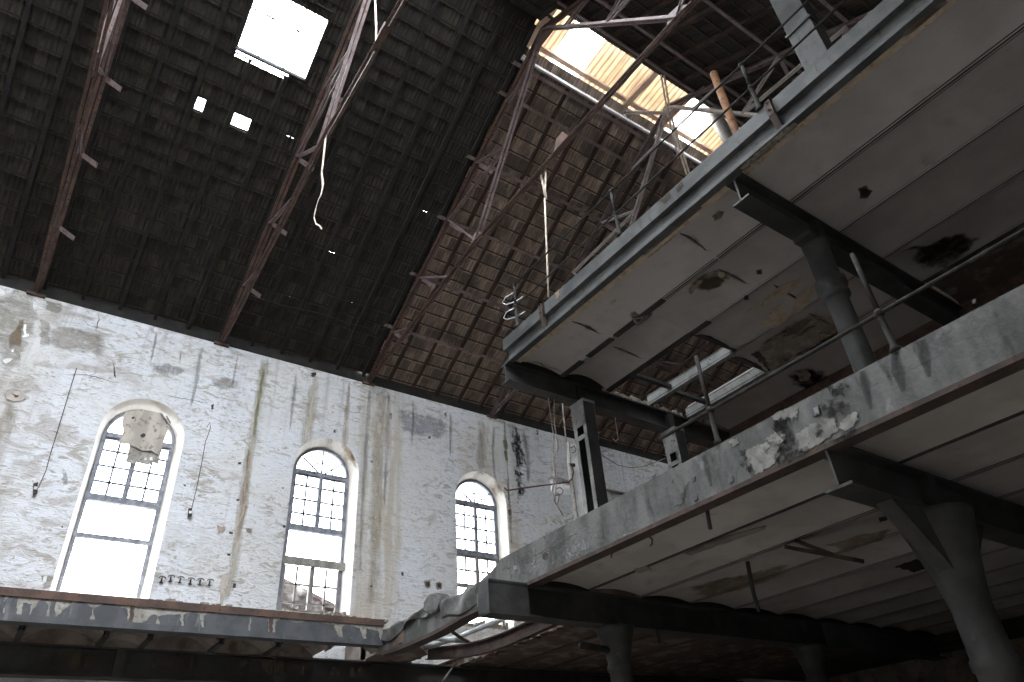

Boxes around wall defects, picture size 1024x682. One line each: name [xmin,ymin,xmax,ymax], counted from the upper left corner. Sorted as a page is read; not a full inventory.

damp [690,271,729,293]
spalling [729,383,860,476]
damp [498,427,538,524]
peeling [0,595,128,622]
peeling [143,580,479,656]